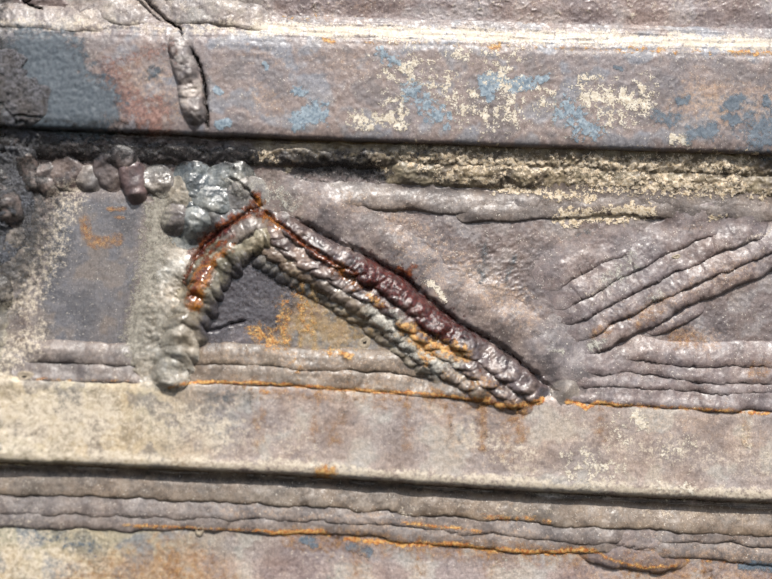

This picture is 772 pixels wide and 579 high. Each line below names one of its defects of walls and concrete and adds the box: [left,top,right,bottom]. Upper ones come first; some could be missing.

corrosion [98,38,177,139]
crack [148,2,209,127]
peeling [214,118,233,130]
peeling [288,85,330,133]
peeling [345,33,772,162]
corrosion [167,192,545,438]
corrosion [565,400,769,415]
corrosion [254,529,677,569]